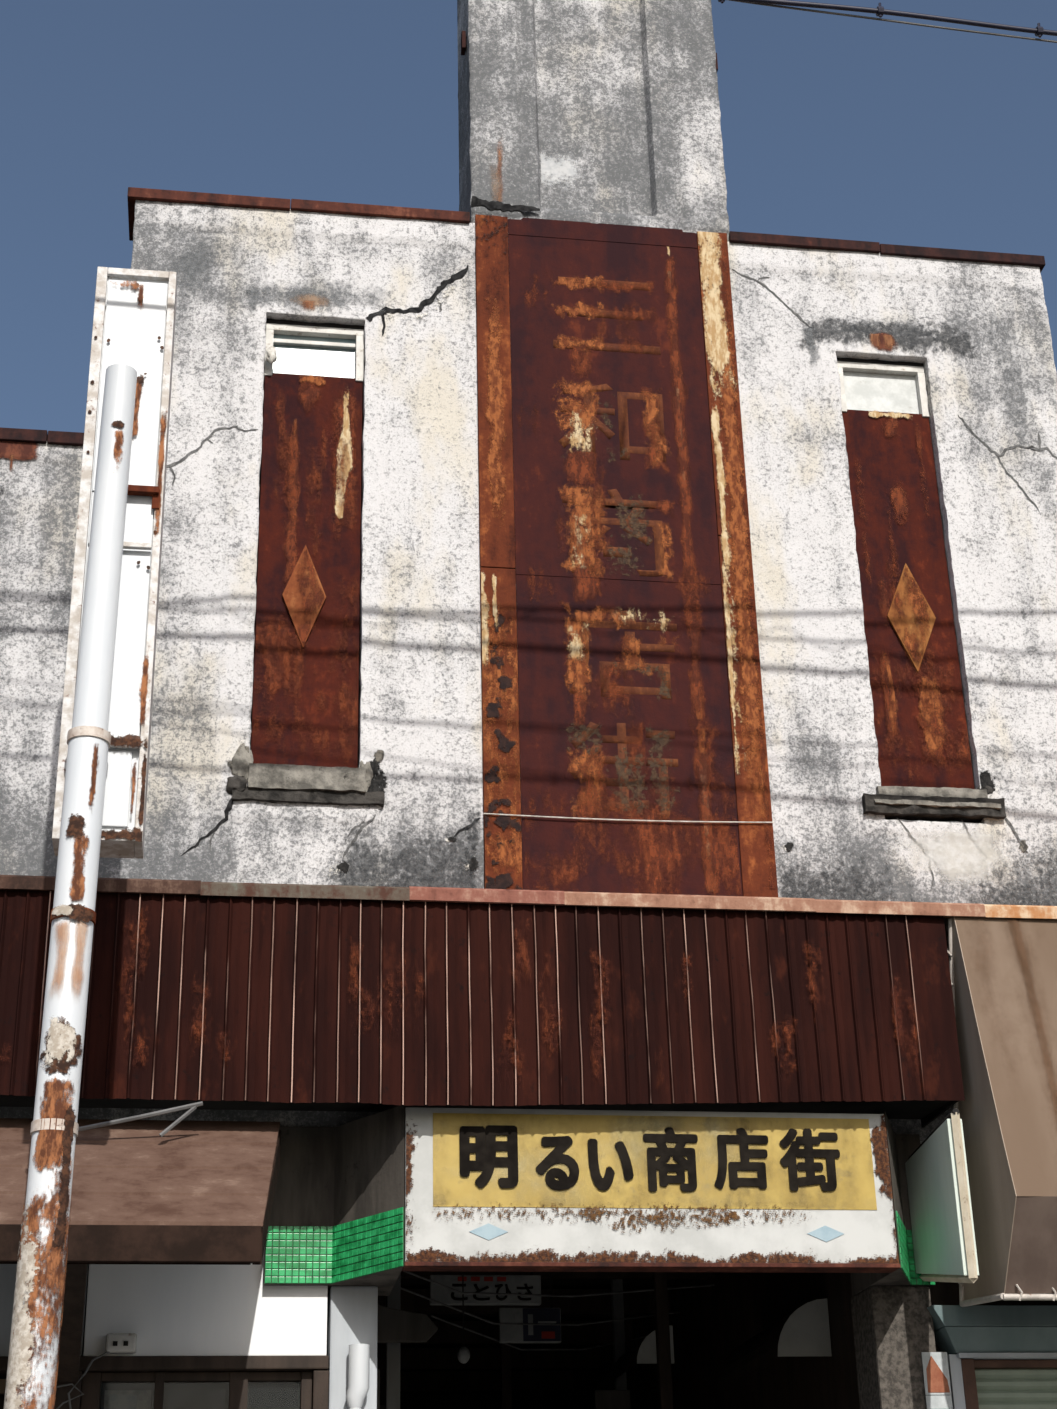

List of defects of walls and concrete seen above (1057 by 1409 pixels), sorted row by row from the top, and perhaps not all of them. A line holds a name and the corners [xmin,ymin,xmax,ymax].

crack [366,265,469,336]
rust [0,441,38,470]
rust [111,420,125,467]
crack [167,425,258,486]
rust [869,411,928,506]
crack [958,415,1057,512]
rust [255,375,359,694]
rust [876,488,971,765]
rust [253,686,358,755]
rust [52,744,98,991]
crack [182,798,233,855]
rust [13,1016,83,1409]